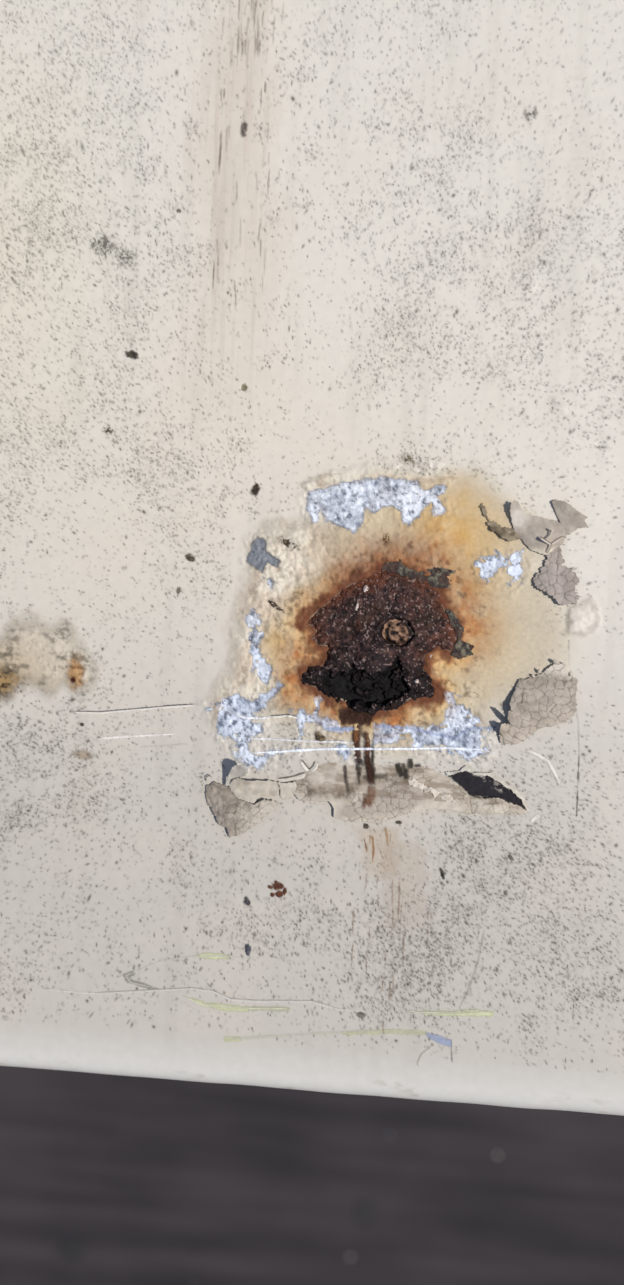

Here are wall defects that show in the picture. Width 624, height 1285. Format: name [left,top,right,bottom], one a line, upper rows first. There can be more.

peeling [305,476,447,534]
peeling [247,537,281,589]
peeling [381,559,456,589]
peeling [474,499,589,606]
rust [265,485,549,807]
rust [0,670,17,694]
rust [68,659,84,688]
peeling [205,609,578,837]
rust [268,881,287,897]